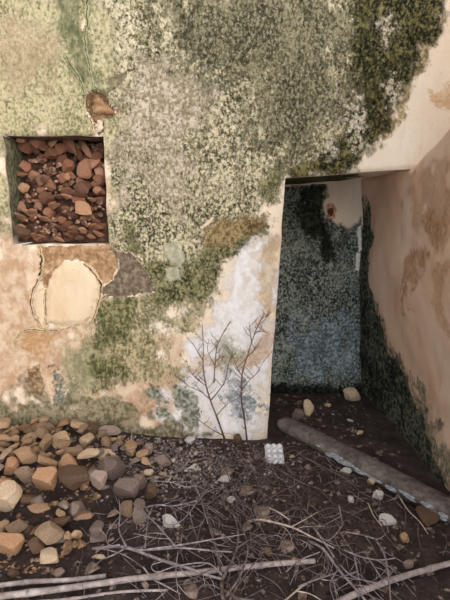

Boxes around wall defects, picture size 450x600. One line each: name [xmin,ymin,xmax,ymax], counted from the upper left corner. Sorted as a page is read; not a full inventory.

flaking render [86,90,119,135]
crack [12,246,107,348]
flaking render [37,243,155,297]
water stain [0,0,446,440]
water stain [261,184,450,485]